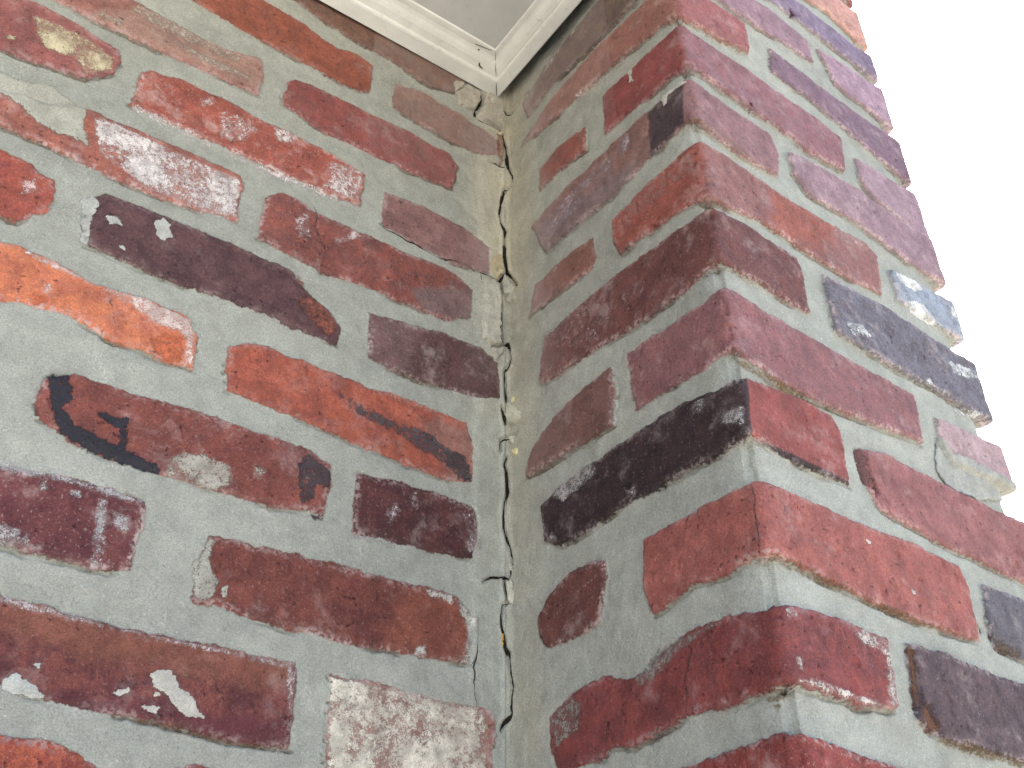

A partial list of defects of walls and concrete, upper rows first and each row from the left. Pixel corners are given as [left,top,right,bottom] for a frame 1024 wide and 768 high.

leakage [133,105,211,147]
leakage [96,120,240,216]
leakage [223,151,361,207]
crack [379,55,518,731]
peeling [141,691,161,714]